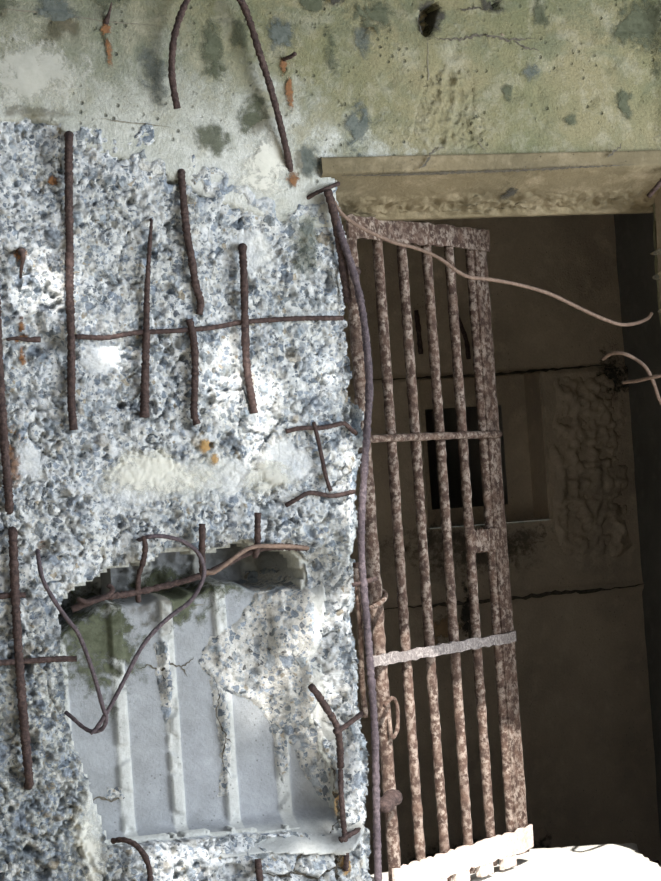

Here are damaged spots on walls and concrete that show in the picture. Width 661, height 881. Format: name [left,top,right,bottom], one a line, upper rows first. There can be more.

spalling [418,11,427,31]
damp [418,0,445,34]
damp [481,0,504,12]
corrosion [280,60,294,108]
corrosion [15,316,28,365]
corrosion [9,444,21,487]
corrosion [200,439,219,464]
spalling [0,118,378,881]
damp [58,586,146,691]